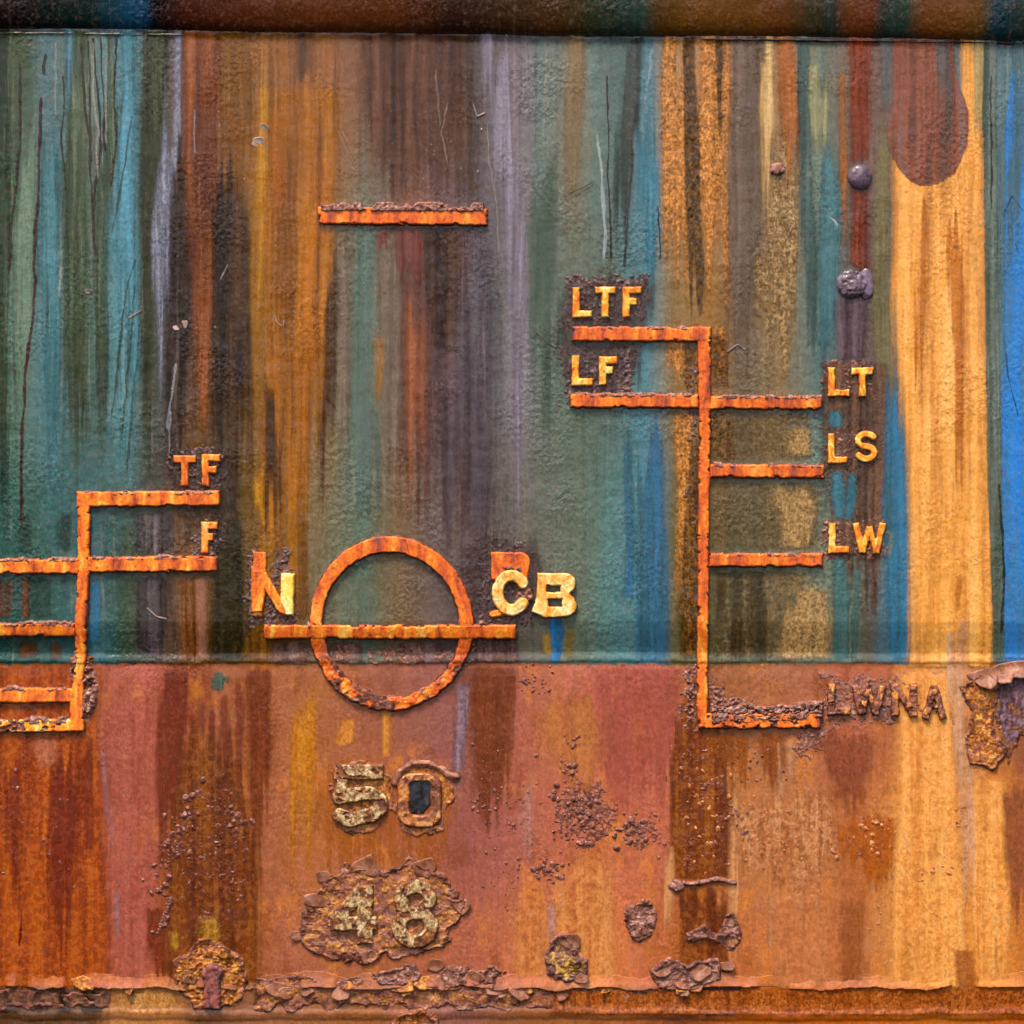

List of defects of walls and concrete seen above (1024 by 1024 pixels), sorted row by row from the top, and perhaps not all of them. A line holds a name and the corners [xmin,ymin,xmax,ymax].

water stain [881,38,892,102]
corrosion [242,32,484,664]
corrosion [511,36,1024,1014]
corrosion [0,651,111,1011]
corrosion [291,699,315,852]
corrosion [119,724,520,1024]
corrosion [336,720,354,745]
corrosion [329,566,554,695]
peeling [967,660,1024,691]
peeling [0,972,204,995]
peeling [220,970,953,1002]
peeling [973,970,1024,988]